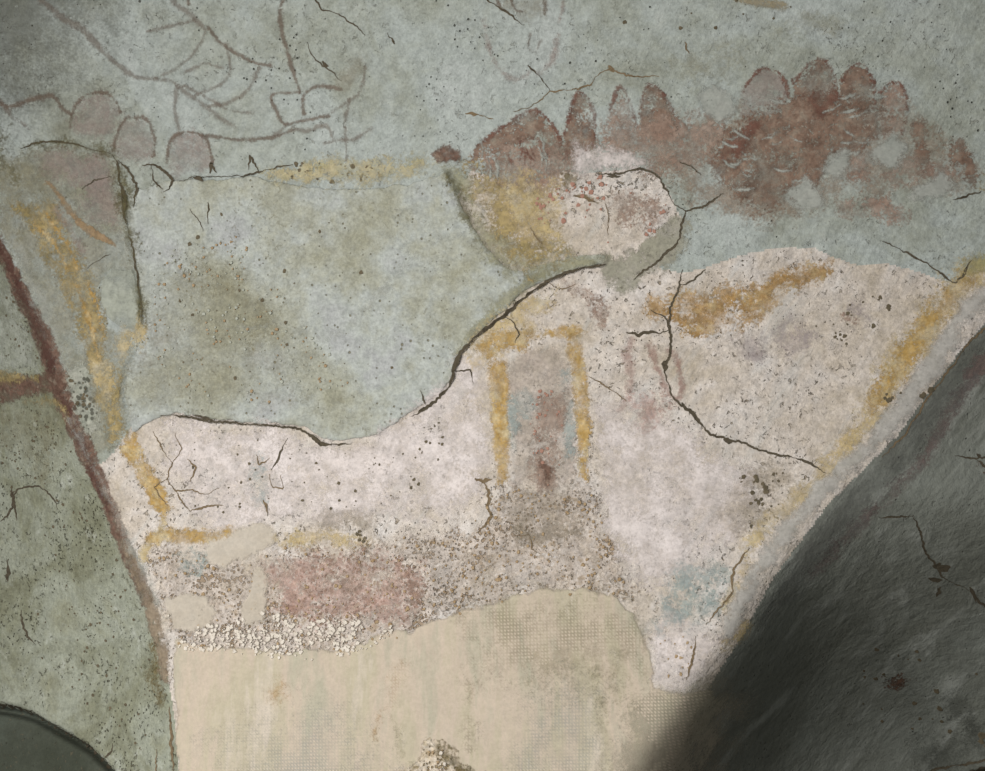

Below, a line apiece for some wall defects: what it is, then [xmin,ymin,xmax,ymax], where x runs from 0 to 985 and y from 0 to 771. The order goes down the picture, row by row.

crack [487,0,522,25]
crack [574,195,609,233]
crack [413,264,606,416]
crack [597,167,825,473]
crack [153,415,348,516]
crack [882,515,985,607]
flaking render [404,738,475,771]